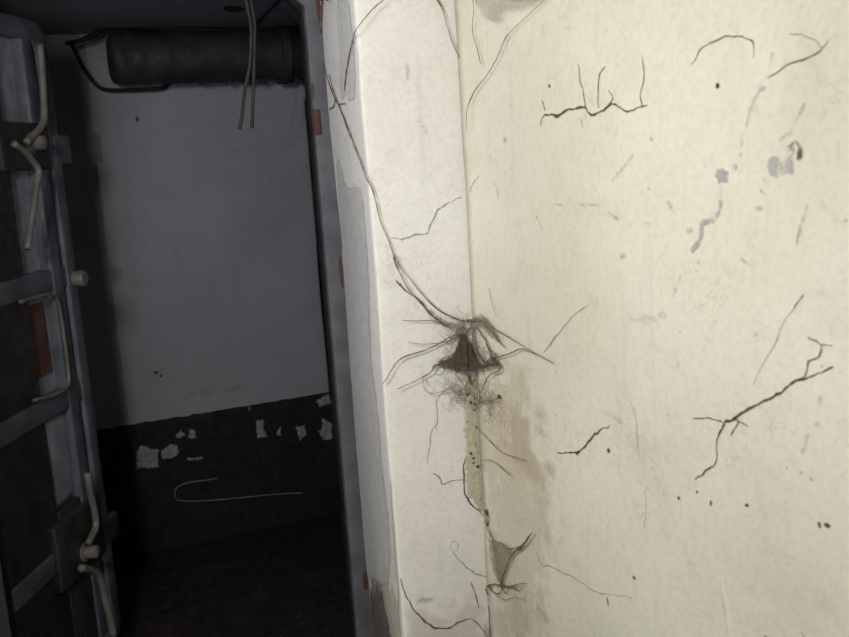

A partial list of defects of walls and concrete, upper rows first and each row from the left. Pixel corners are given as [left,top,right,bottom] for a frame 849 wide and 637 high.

crack [690,35,754,65]
crack [768,33,828,78]
crack [540,59,647,126]
peeling [316,394,331,407]
crack [693,295,833,479]
peeling [136,429,197,469]
peeling [256,419,281,438]
peeling [318,418,333,440]
crack [557,425,610,455]